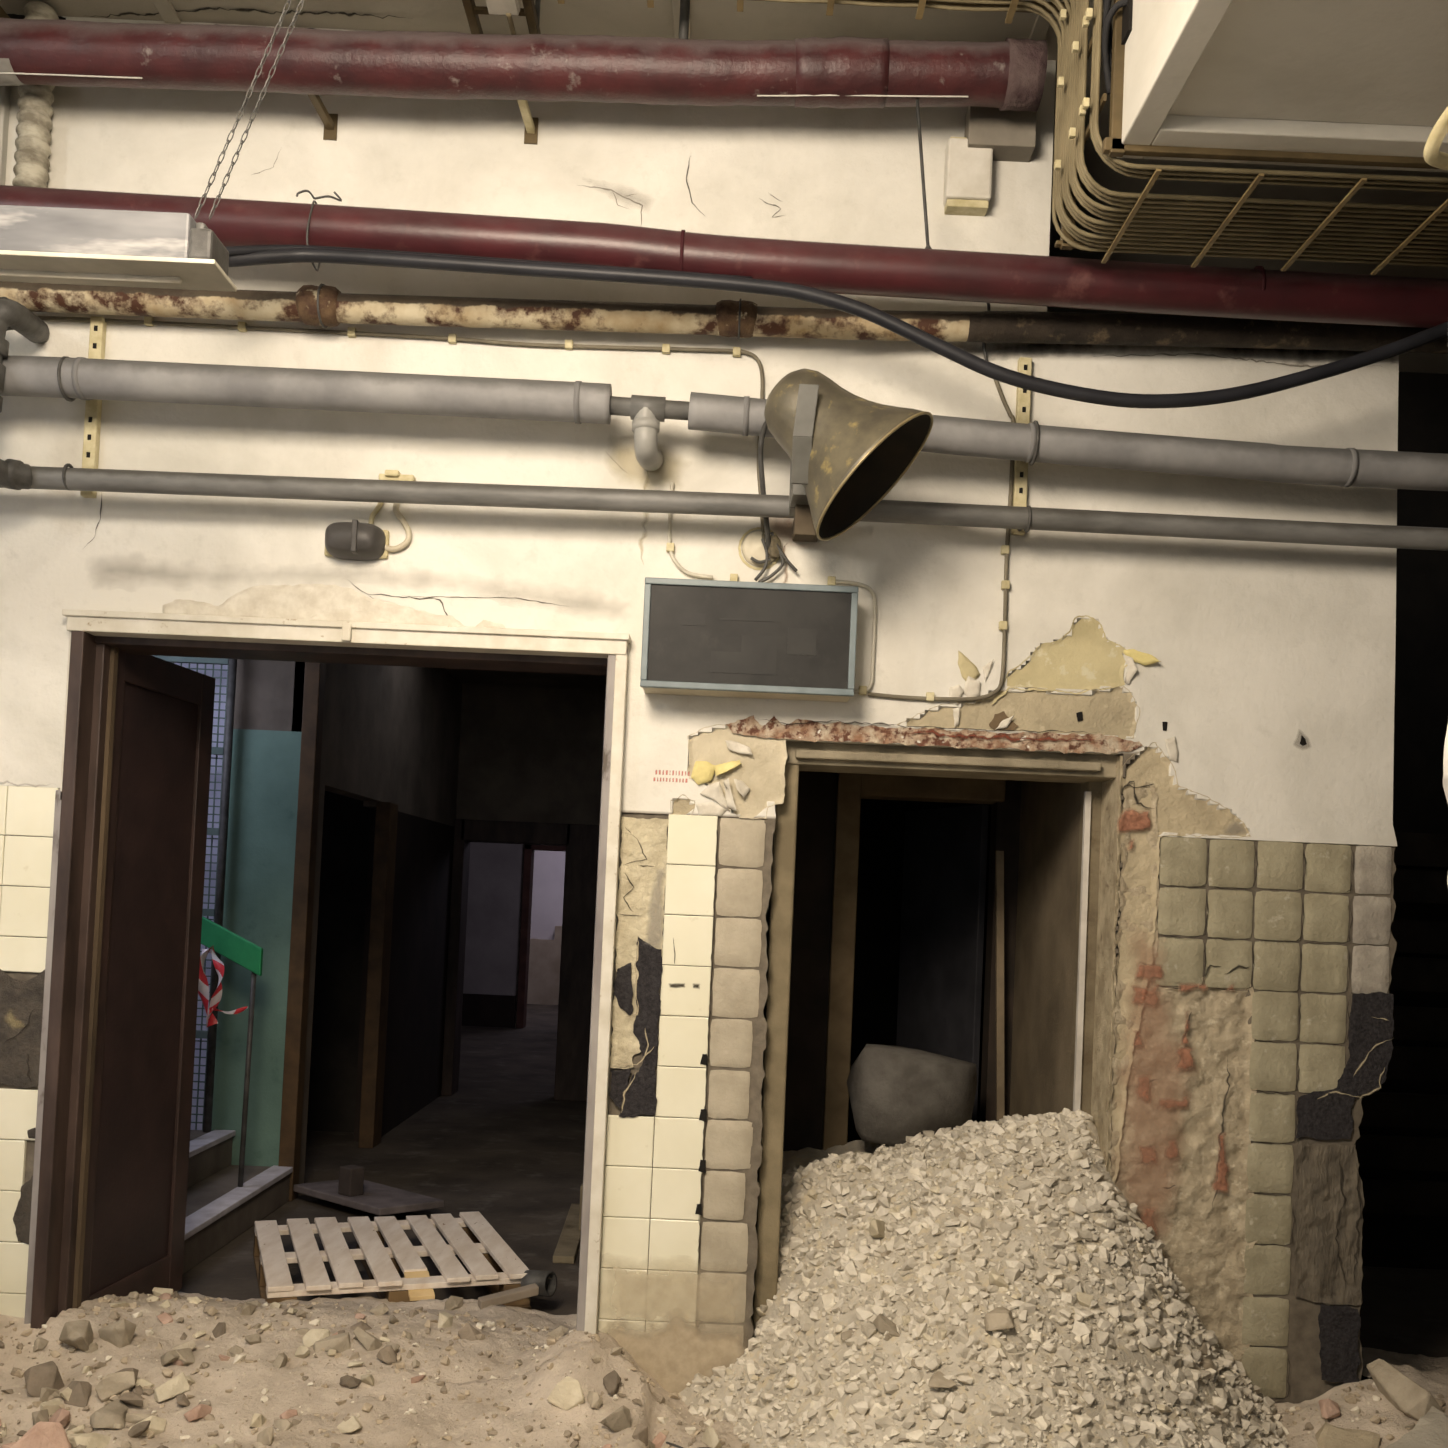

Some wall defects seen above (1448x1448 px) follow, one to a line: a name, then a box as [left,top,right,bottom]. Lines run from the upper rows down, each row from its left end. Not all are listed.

peeling [0,969,45,1089]
peeling [610,615,1392,1400]